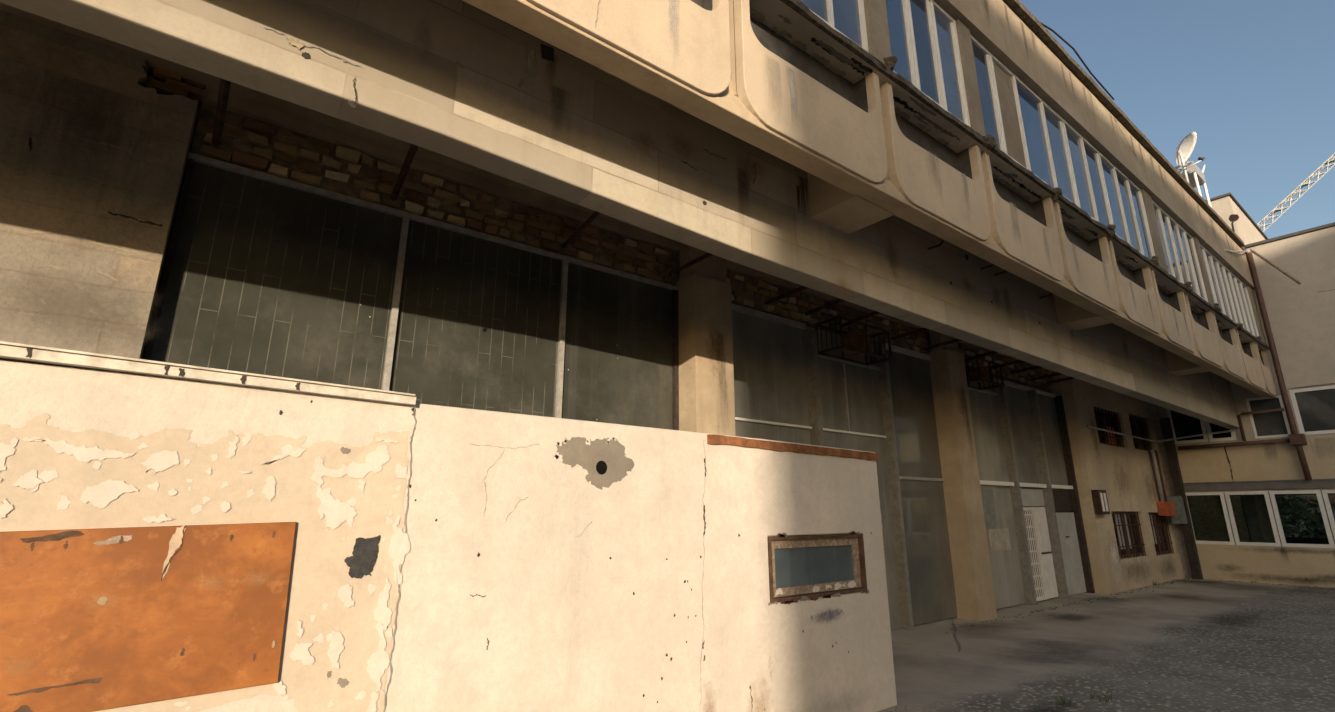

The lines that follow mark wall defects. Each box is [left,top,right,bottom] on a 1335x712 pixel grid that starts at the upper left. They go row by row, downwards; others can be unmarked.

peeling [0,413,416,712]